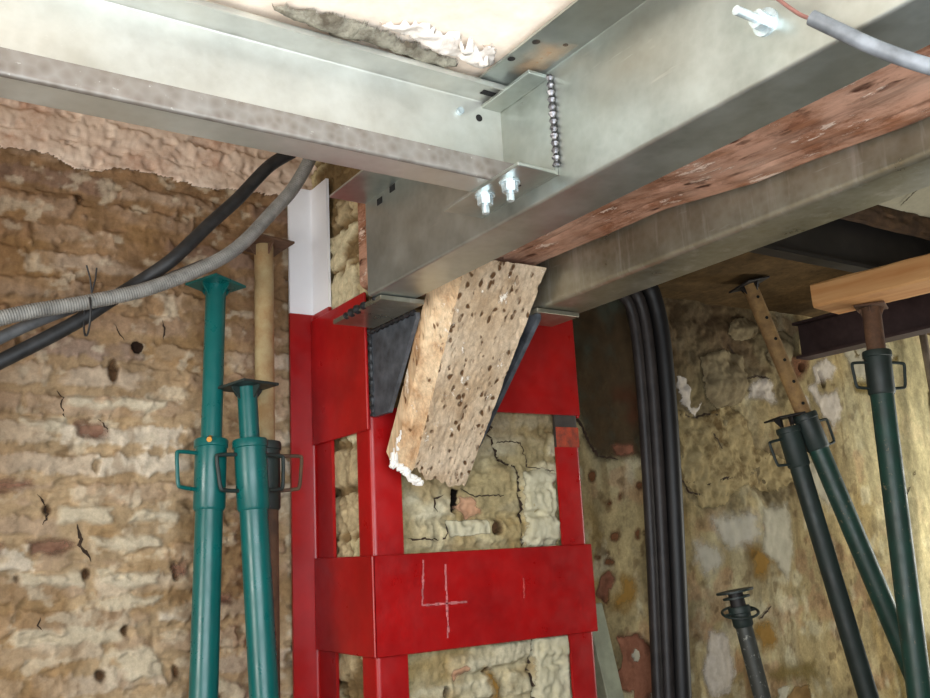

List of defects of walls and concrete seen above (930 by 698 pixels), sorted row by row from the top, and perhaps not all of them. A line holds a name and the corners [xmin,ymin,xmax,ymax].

flaking render [380,20,496,69]
flaking render [0,97,276,190]
flaking render [253,157,303,196]
crack [576,418,618,460]
flaking render [676,376,794,509]
crack [409,425,554,546]
crack [77,524,91,561]
leakage [696,514,770,576]
crack [525,639,535,698]
flaking render [616,633,652,698]